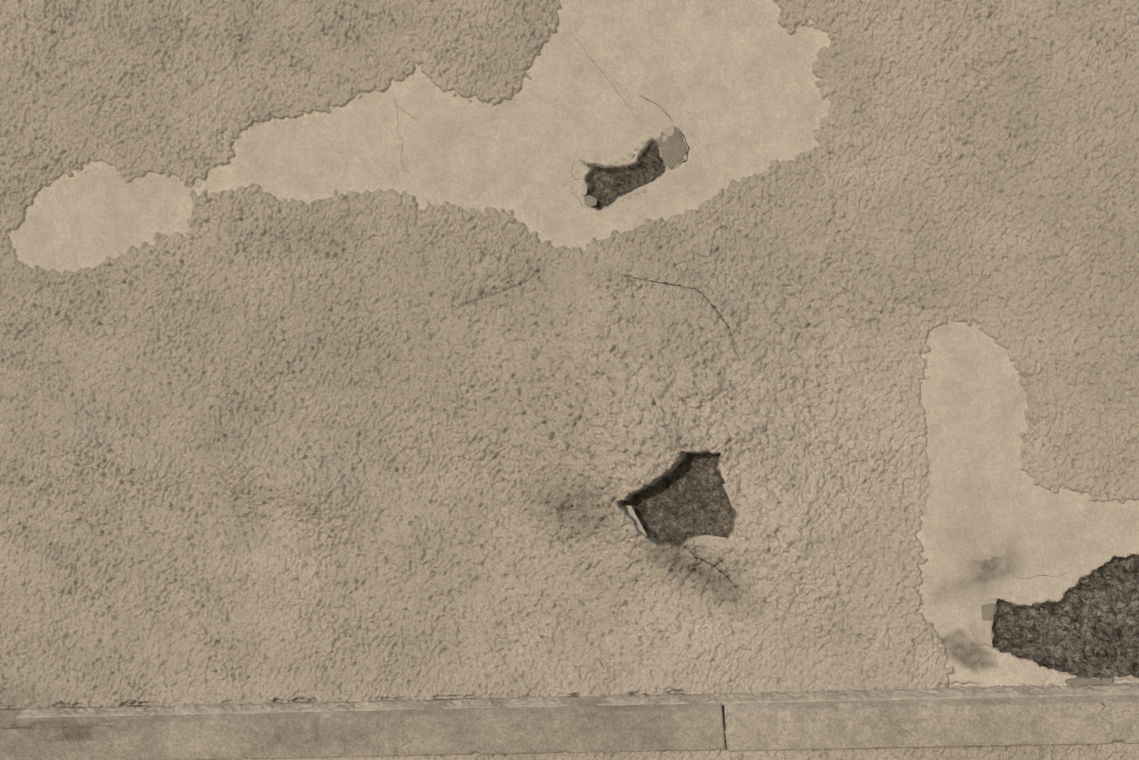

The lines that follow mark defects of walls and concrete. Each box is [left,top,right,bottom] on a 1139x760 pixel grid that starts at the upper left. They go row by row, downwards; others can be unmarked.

flaking render [10,0,831,274]
spalling [623,452,737,547]
flaking render [916,317,1139,688]